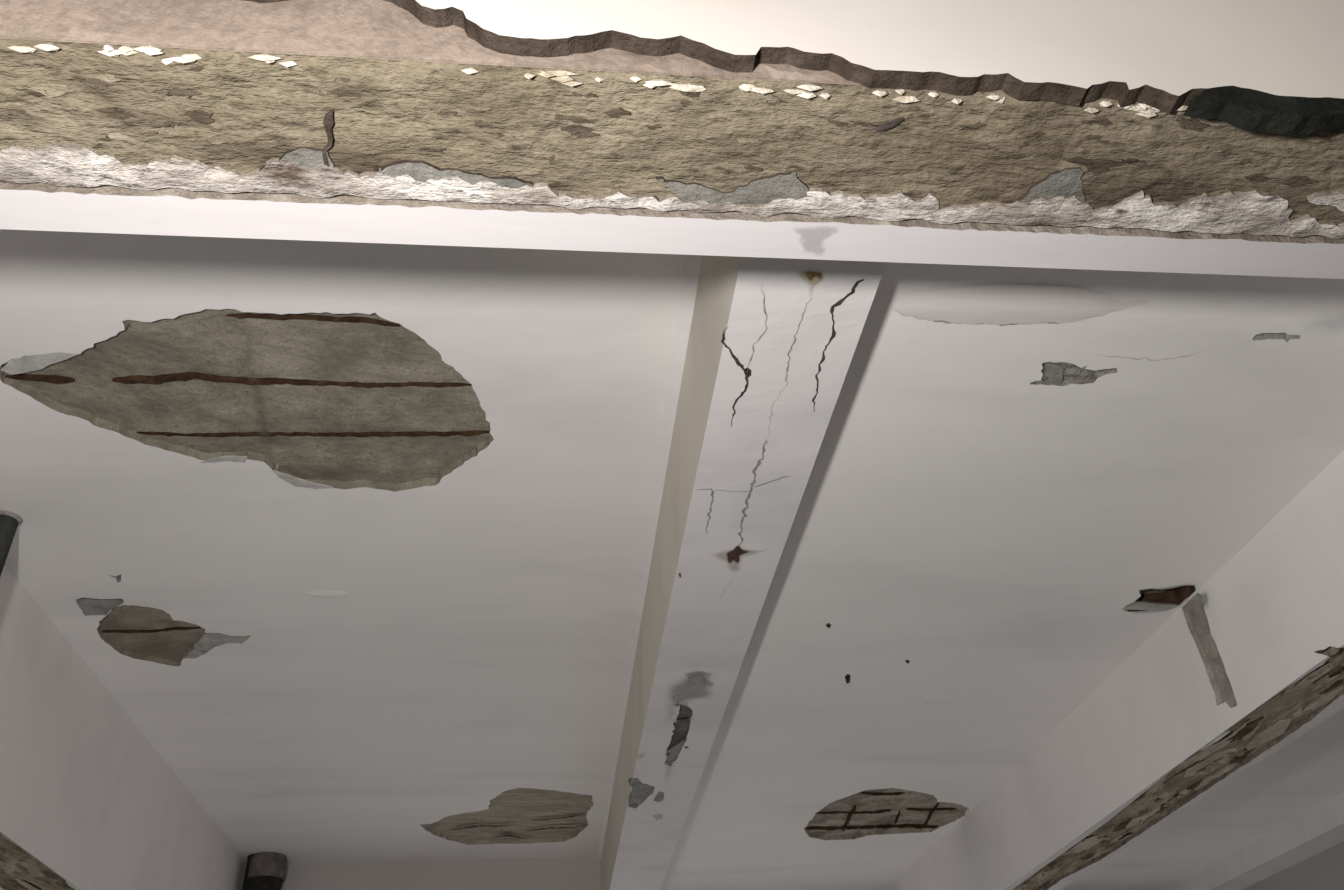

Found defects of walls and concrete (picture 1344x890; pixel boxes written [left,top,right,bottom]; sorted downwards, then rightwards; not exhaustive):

spalling [0,0,1344,239]
spalling [1252,333,1300,342]
spalling [0,309,494,492]
crack [699,279,864,546]
spalling [1030,362,1117,386]
spalling [76,598,250,667]
flaking render [664,703,694,766]
spalling [1012,585,1344,890]
spalling [420,788,594,845]
flaking render [628,777,664,820]
spalling [804,788,969,840]
spalling [0,833,75,890]